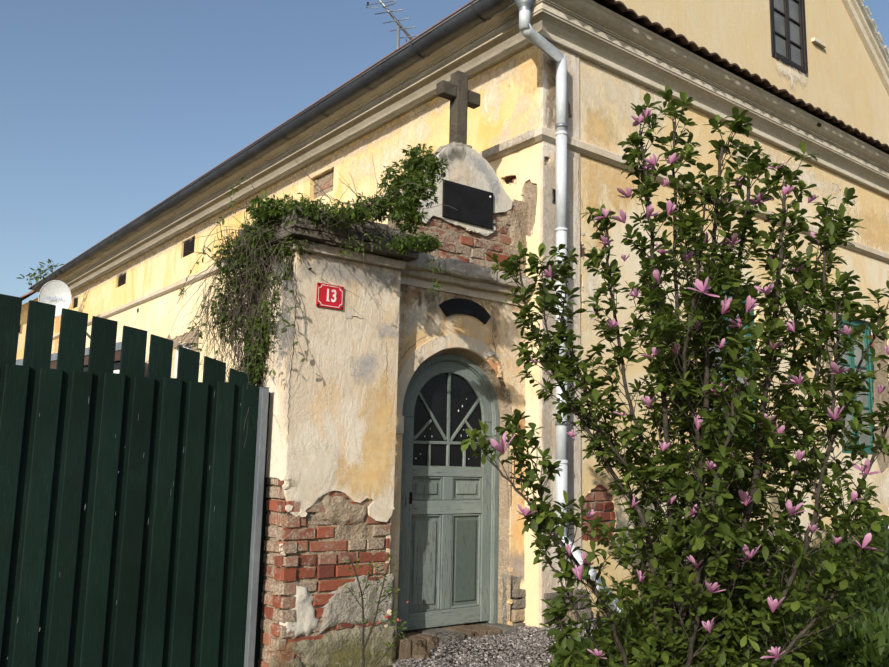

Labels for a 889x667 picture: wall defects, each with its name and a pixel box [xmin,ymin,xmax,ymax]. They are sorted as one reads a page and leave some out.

flaking render [388,176,537,276]
flaking render [581,484,618,542]
flaking render [258,475,396,667]